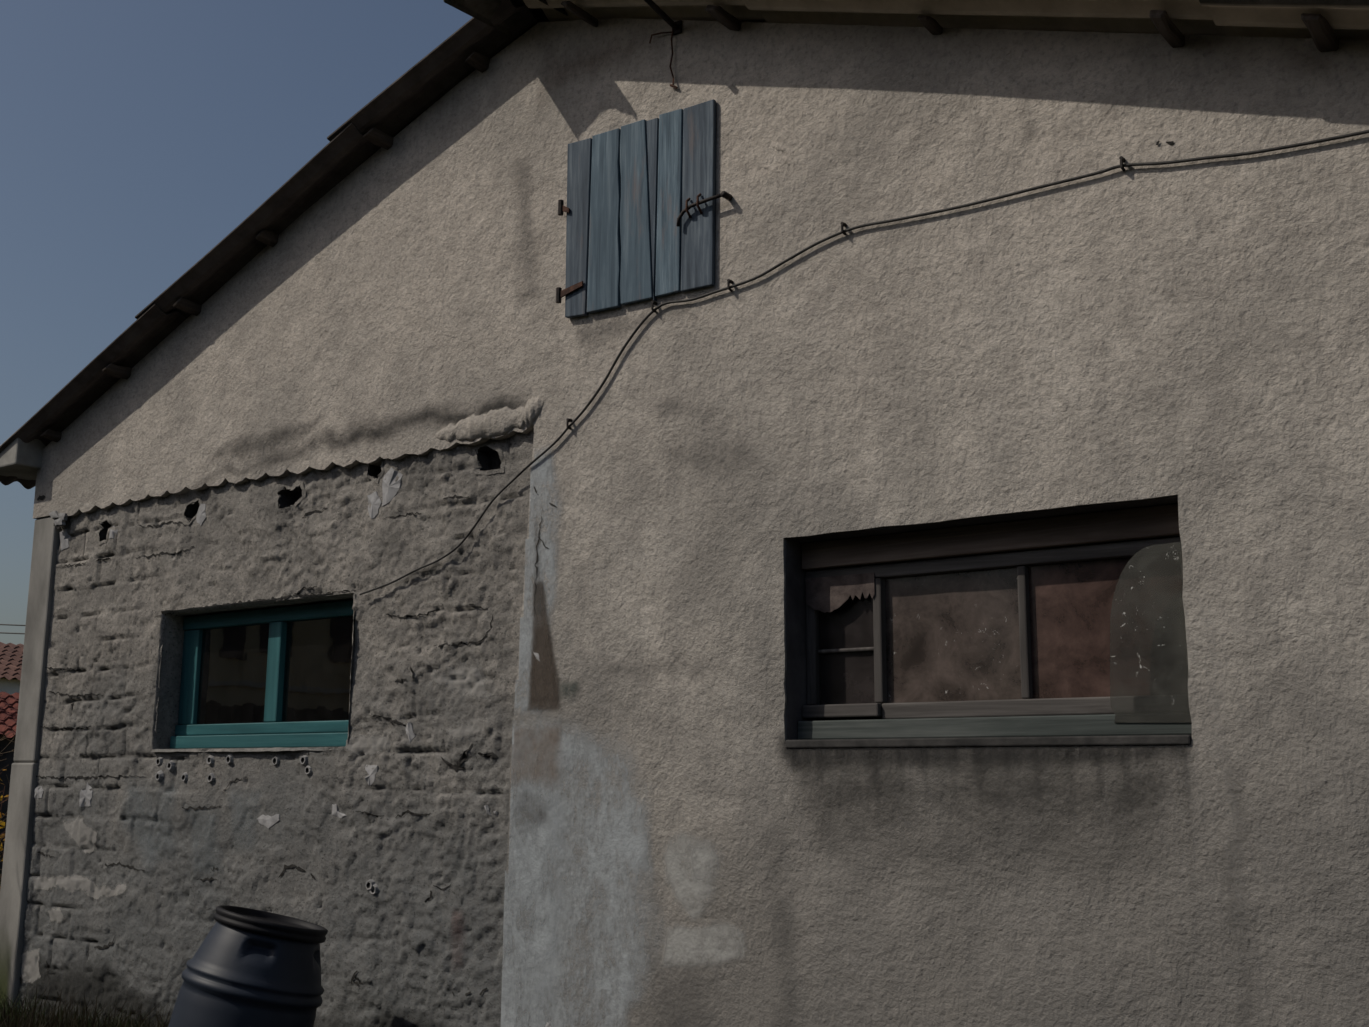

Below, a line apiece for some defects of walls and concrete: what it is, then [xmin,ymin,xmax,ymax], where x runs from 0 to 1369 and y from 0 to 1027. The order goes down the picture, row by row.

water stain [412,400,509,422]
spalling [274,481,306,513]
crack [55,521,194,568]
peeling [514,454,556,710]
crack [41,667,103,731]
crack [34,762,144,780]
water stain [783,744,1181,764]
crack [355,809,430,817]
crack [279,864,316,880]
peeling [484,724,648,1027]
peeling [32,874,127,924]
peeling [21,948,41,983]